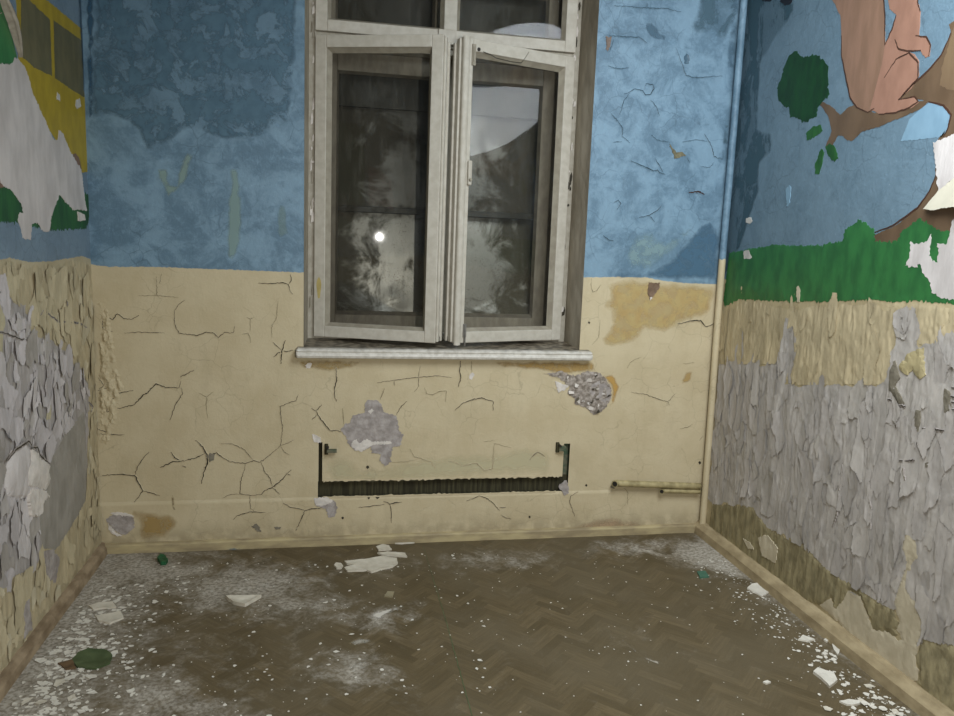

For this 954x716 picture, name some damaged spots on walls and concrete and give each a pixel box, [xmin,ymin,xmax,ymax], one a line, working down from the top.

peeling [0,0,87,240]
water stain [607,0,792,343]
peeling [923,134,954,210]
crack [40,274,293,364]
crack [678,319,714,328]
crack [377,361,494,416]
flaking render [544,371,612,415]
peeling [0,260,135,674]
crack [89,367,345,531]
crack [359,501,402,523]
peeling [698,219,954,711]
peeling [34,648,112,687]